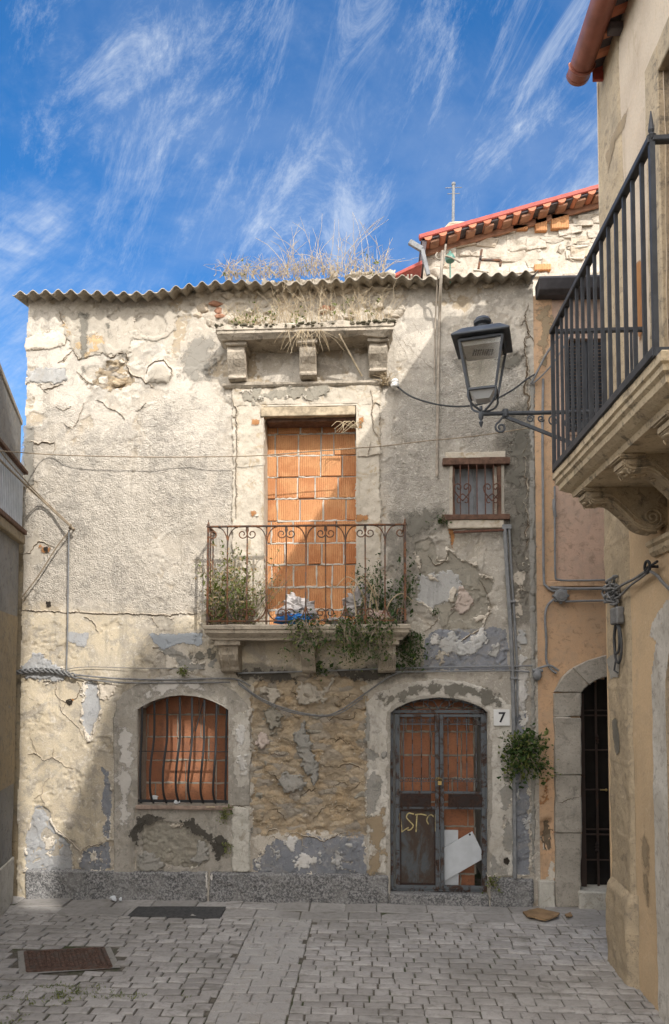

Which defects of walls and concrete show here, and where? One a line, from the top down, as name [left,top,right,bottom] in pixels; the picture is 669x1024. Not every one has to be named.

crack [30,311,156,393]
peeling [239,385,330,405]
peeling [152,646,217,674]
peeling [412,537,530,744]
crack [55,681,83,736]
peeling [70,677,117,743]
peeling [364,713,387,818]
peeling [23,767,113,872]
peeling [253,832,368,875]
peeling [485,766,555,880]